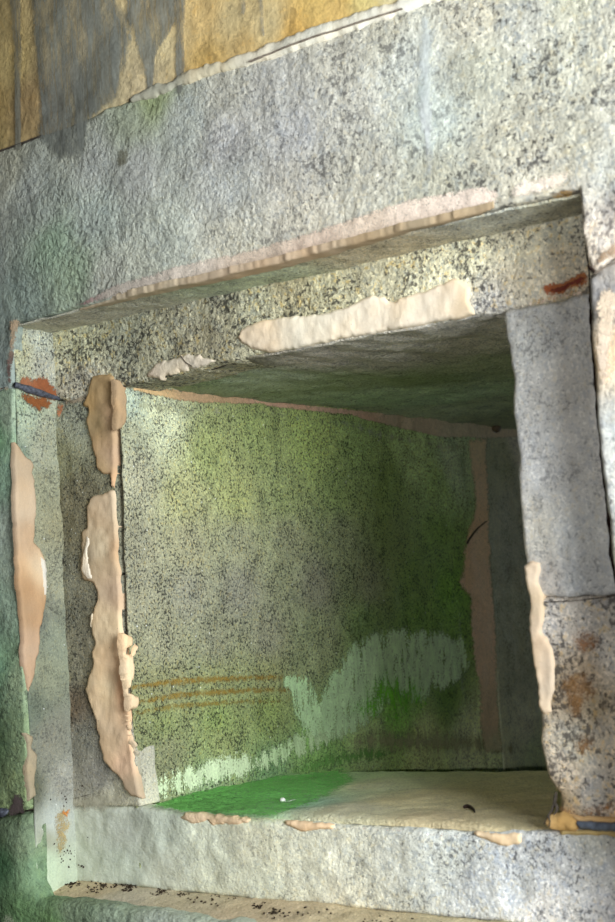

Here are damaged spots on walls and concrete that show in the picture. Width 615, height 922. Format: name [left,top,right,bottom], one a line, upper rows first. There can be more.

leakage [11,0,21,149]
leakage [33,0,185,156]
corrosion [538,272,588,303]
corrosion [20,377,63,416]
peeling [110,379,127,431]
crack [549,244,615,602]
peeling [81,537,92,579]
peeling [117,633,145,792]
peeling [560,814,615,837]